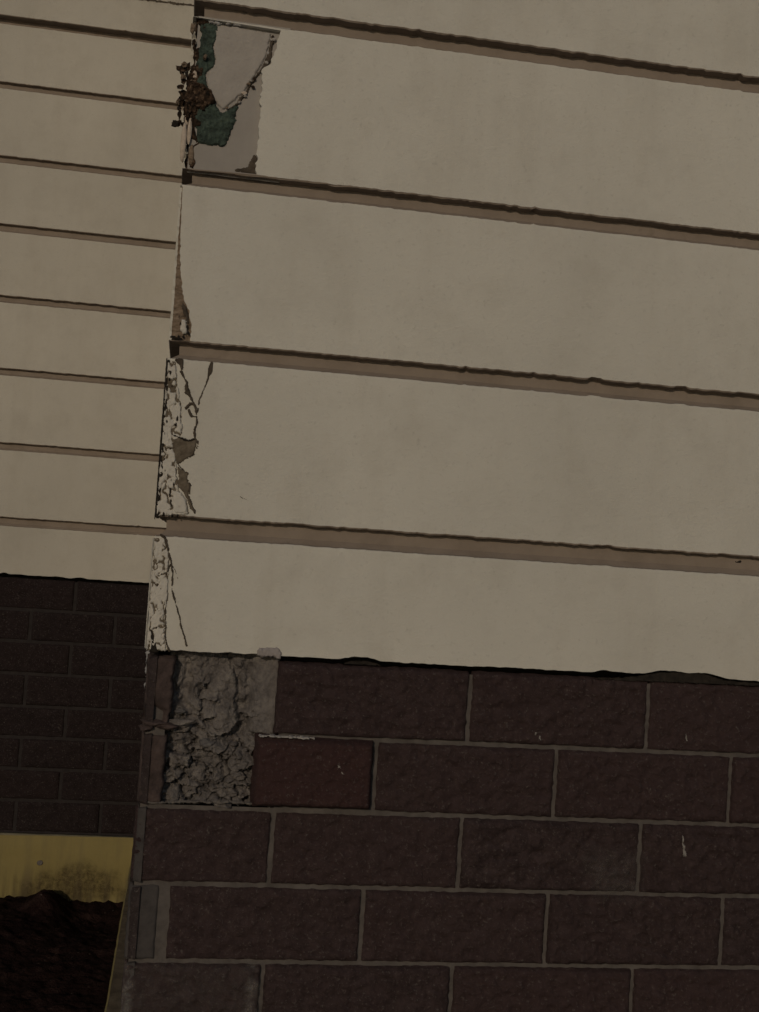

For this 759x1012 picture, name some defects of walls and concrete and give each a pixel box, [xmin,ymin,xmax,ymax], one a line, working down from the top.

spalling [171,16,291,183]
spalling [170,187,192,341]
peeling [154,358,199,519]
crack [175,358,213,442]
crack [160,534,188,652]
spalling [137,538,280,808]